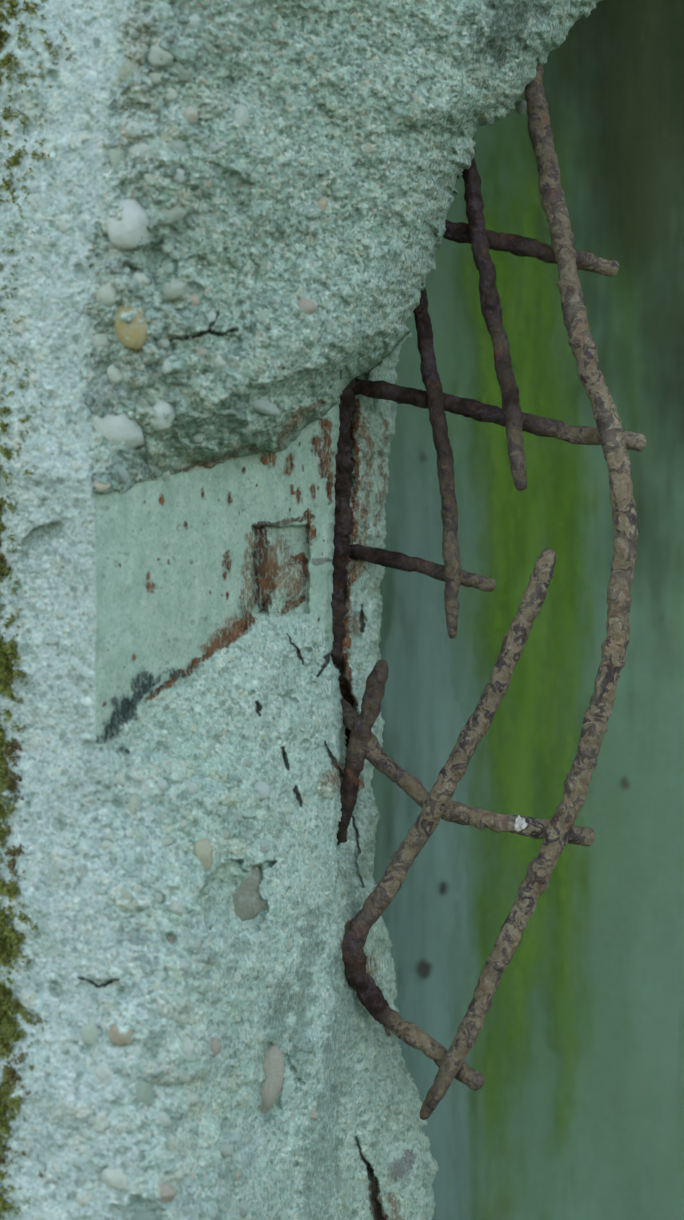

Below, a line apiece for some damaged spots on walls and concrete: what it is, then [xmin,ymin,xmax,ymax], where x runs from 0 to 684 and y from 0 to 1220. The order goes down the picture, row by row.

damp [464,243,502,408]
damp [557,0,684,426]
corrosion [145,399,334,700]
corrosion [322,727,351,789]
spalling [80,0,600,1220]
corrosion [339,398,389,710]
damp [381,453,464,793]
spalling [341,63,647,1120]
damp [475,420,525,666]
damp [385,818,480,1051]
crack [356,1137,382,1220]
damp [398,1039,465,1220]